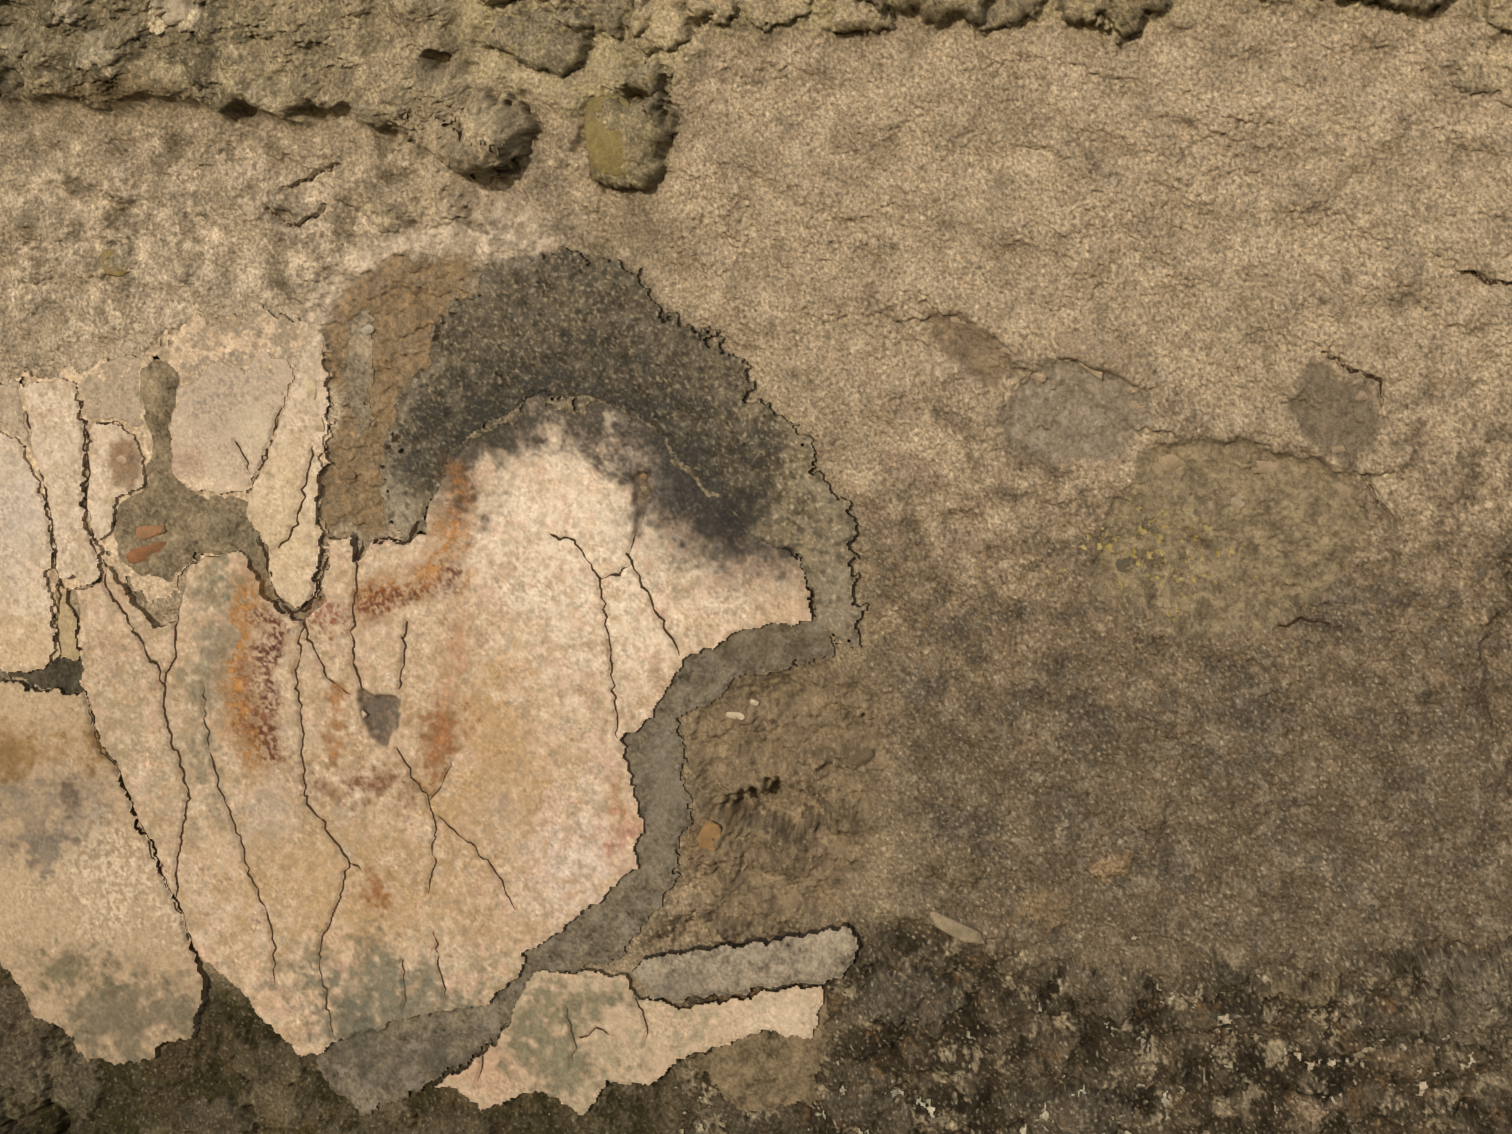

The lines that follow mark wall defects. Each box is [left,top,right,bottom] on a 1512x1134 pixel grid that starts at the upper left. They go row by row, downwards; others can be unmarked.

spalling [306,254,467,533]
damp [384,315,789,561]
crack [23,386,282,982]
crack [256,446,429,1034]
spalling [362,689,399,741]
crack [396,748,515,909]
crack [550,533,679,739]
spalling [696,820,822,892]
spalling [719,696,874,801]
crack [401,931,447,1010]
crack [477,1034,493,1082]
crack [565,997,648,1067]